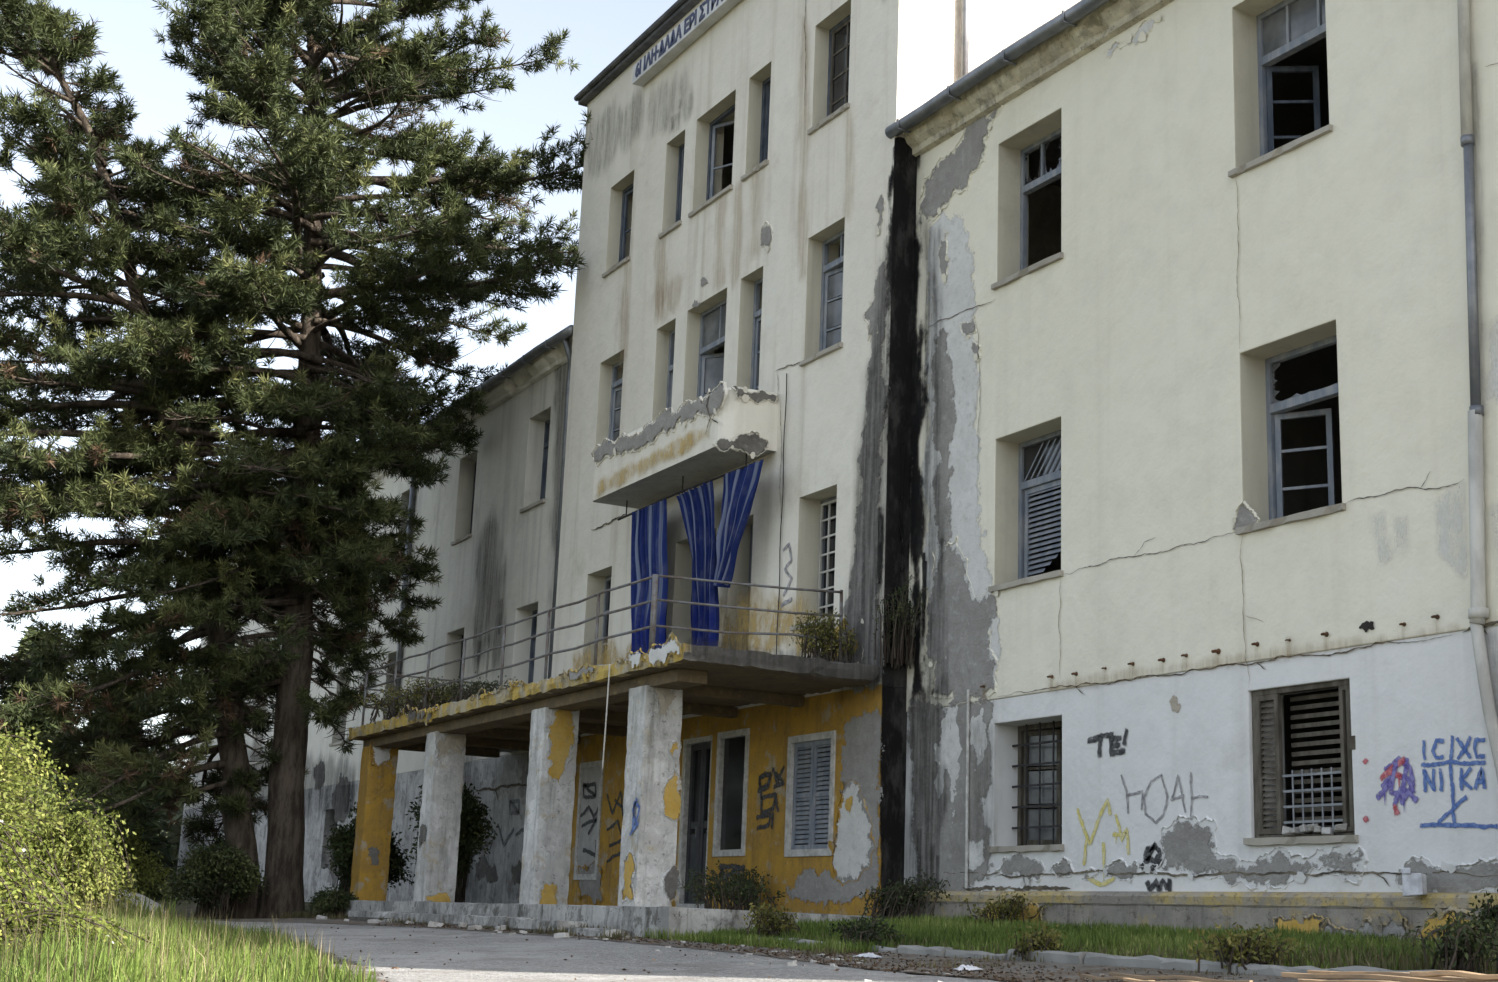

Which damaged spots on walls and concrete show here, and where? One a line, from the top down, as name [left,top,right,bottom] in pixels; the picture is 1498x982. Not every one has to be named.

flaking render [875,193,886,236]
flaking render [593,381,779,467]
flaking render [721,261,891,694]
water stain [689,137,945,916]
peeling [906,105,1369,924]
crack [1345,471,1461,504]
flaking render [558,632,682,681]
peeling [544,709,578,786]
peeling [661,736,685,822]
peeling [785,708,885,911]
flaking render [662,864,683,902]